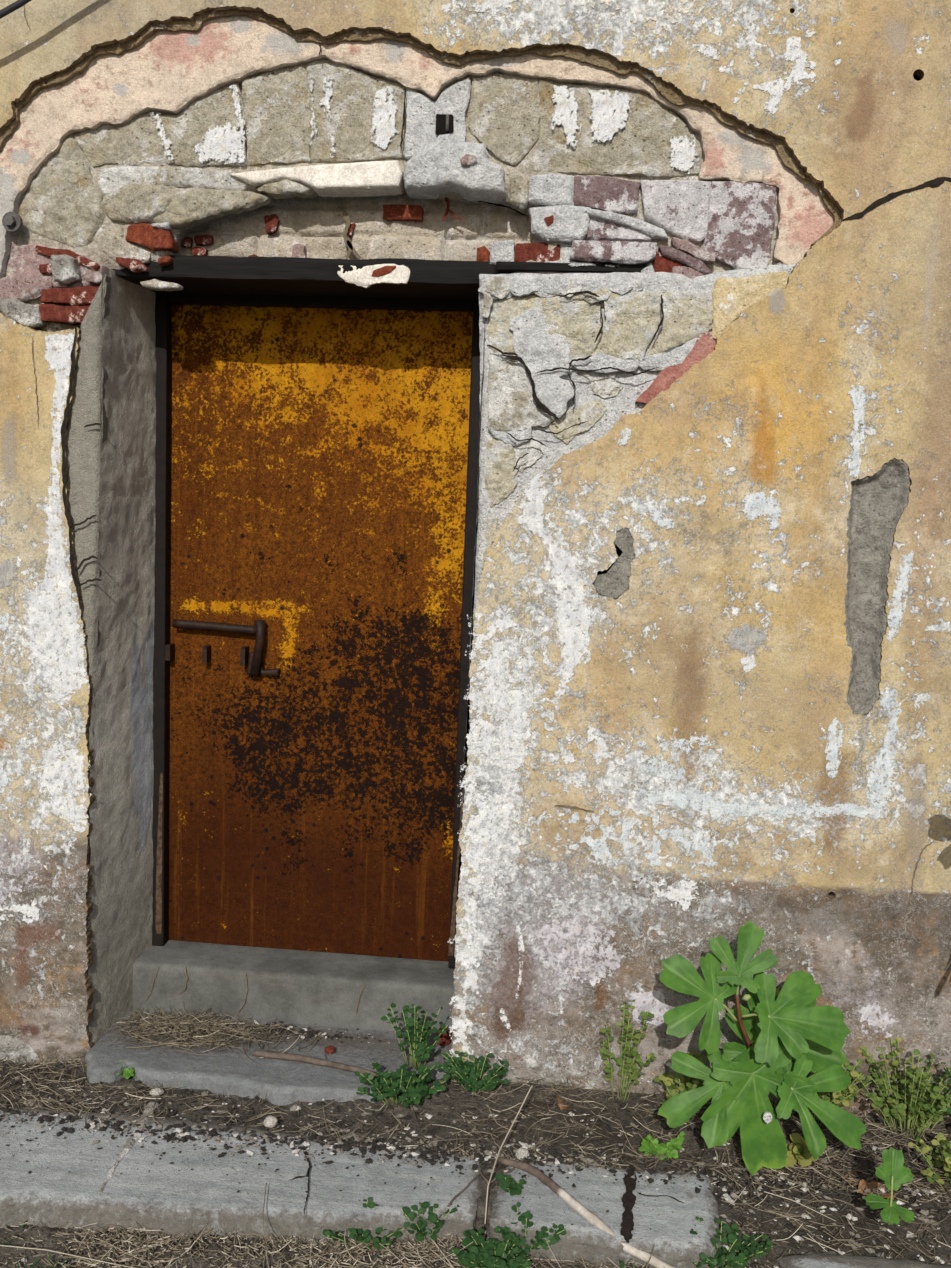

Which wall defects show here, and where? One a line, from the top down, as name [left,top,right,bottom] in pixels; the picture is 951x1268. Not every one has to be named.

peeling [441,0,517,39]
crack [843,177,951,221]
flaking render [0,9,842,1057]
spalling [554,384,915,875]
damp [650,877,725,911]
damp [526,908,629,988]
damp [621,987,671,1029]
damp [856,1000,898,1038]